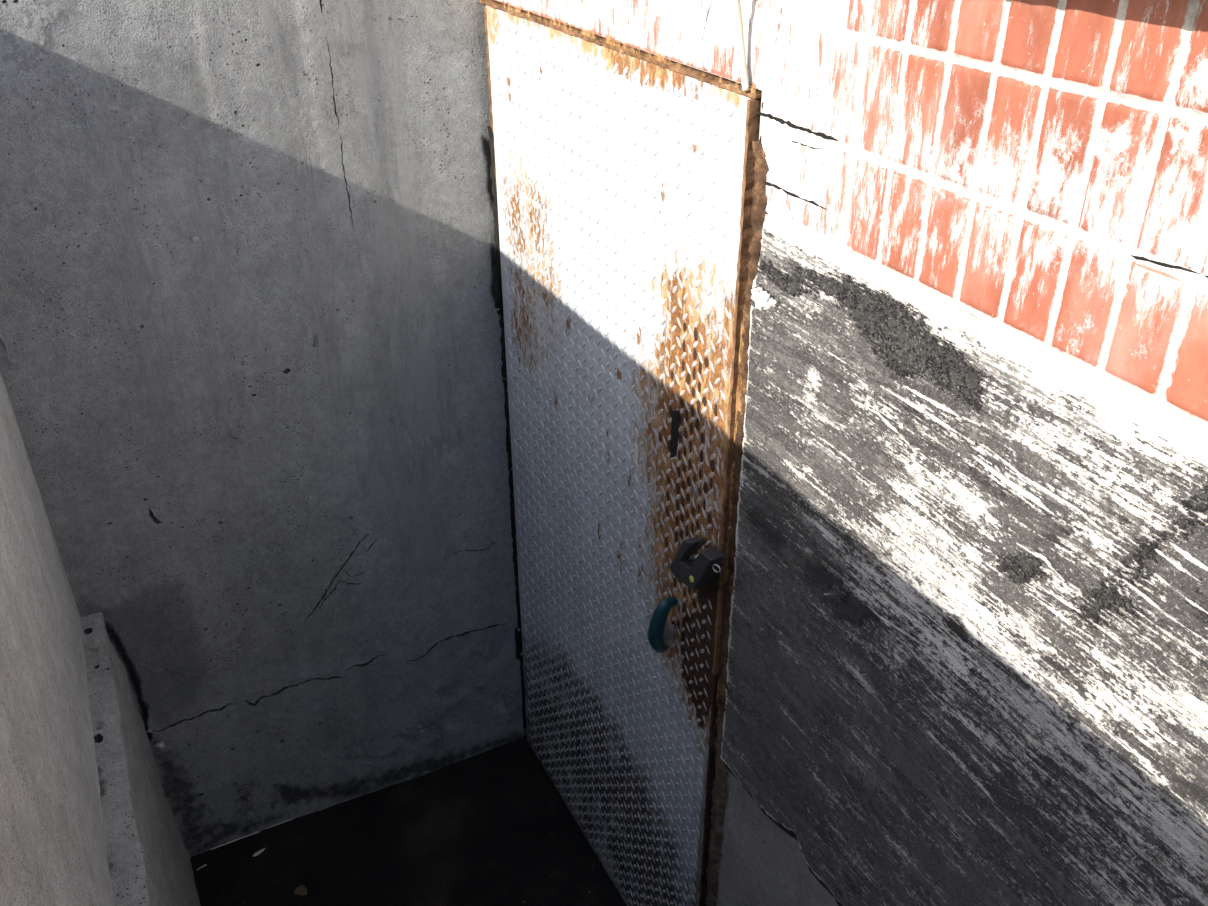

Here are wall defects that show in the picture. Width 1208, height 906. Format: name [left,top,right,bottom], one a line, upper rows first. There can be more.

corrosion [485,4,755,108]
crack [320,0,353,224]
crack [758,112,838,150]
crack [765,181,829,211]
corrosion [500,151,571,372]
crack [1130,255,1208,278]
corrosion [617,245,748,750]
crack [152,623,508,732]